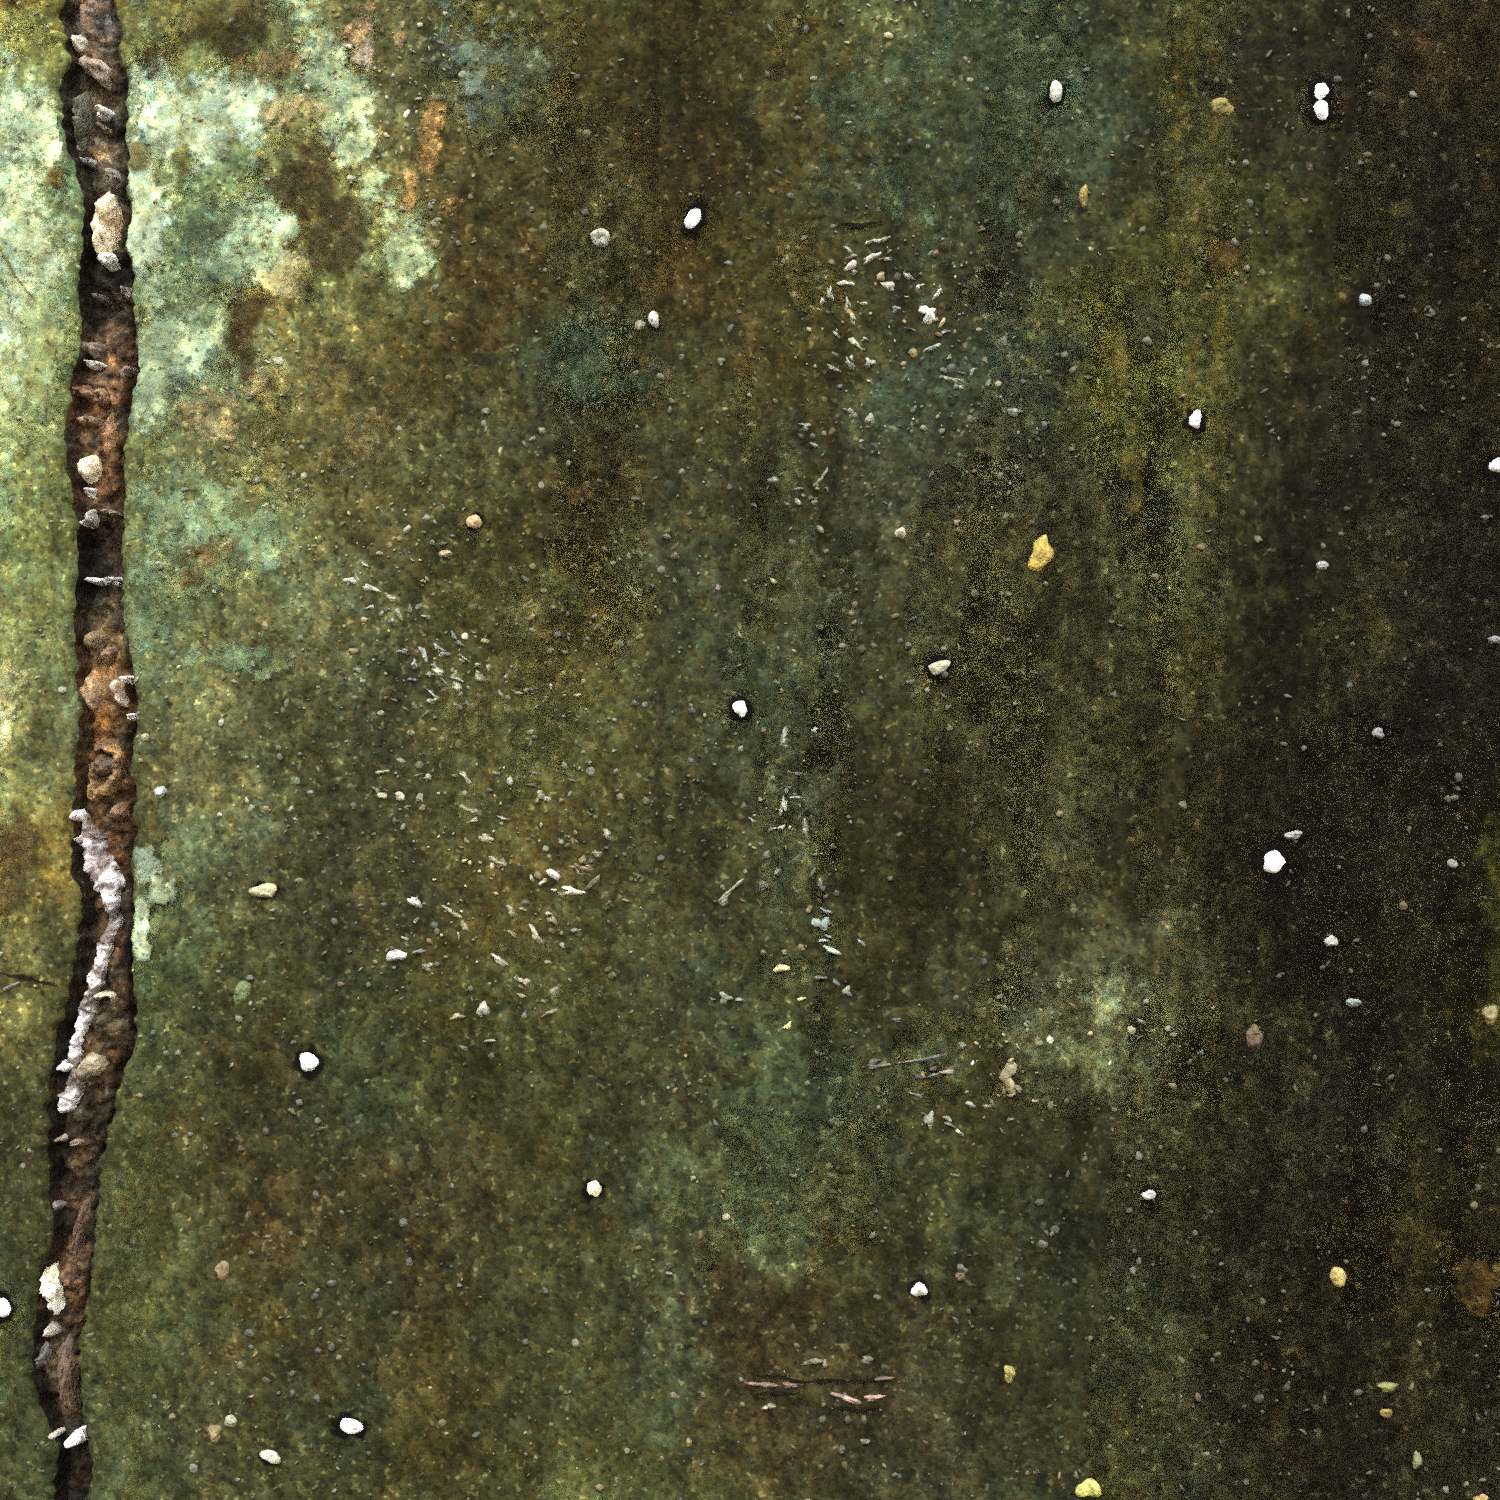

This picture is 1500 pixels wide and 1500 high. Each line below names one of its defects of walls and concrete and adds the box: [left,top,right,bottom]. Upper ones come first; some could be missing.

corrosion [127,141,149,172]
corrosion [45,168,67,187]
crack [0,0,140,1500]